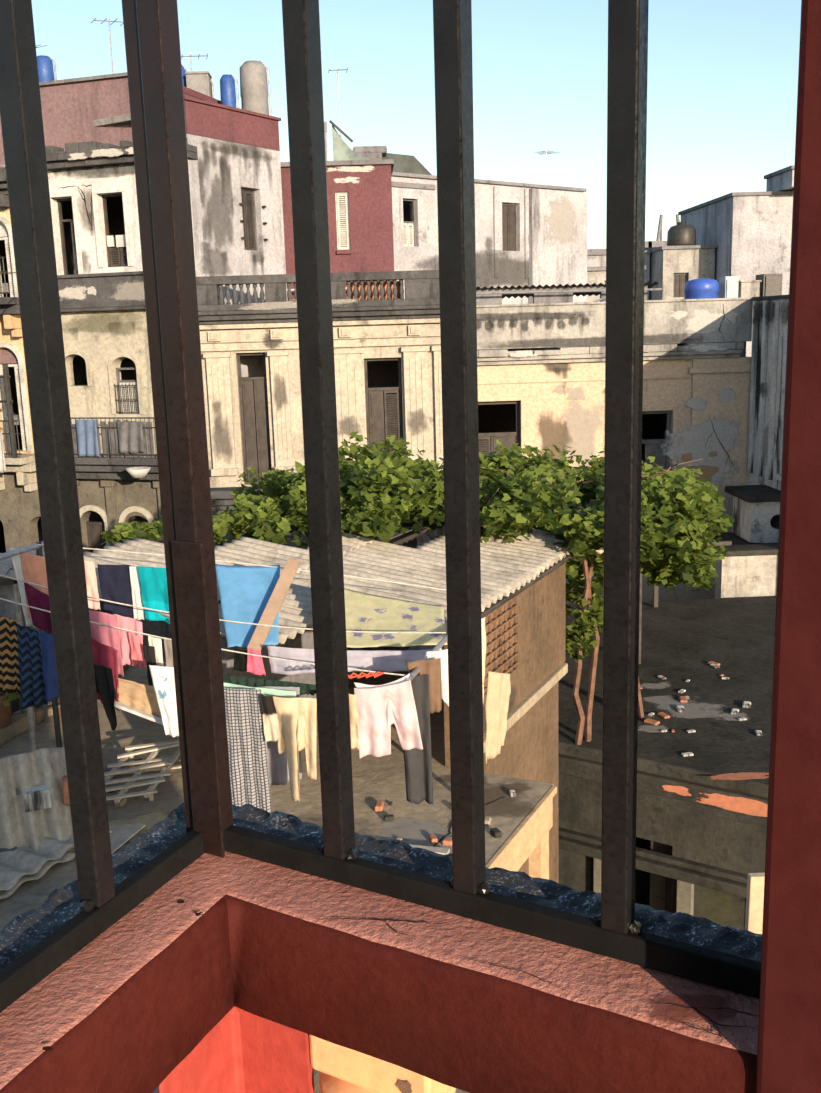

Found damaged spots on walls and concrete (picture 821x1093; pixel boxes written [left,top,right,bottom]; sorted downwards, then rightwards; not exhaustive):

peeling [68,147,134,160]
peeling [327,165,375,183]
peeling [59,286,96,300]
peeling [116,283,145,300]
water stain [546,363,570,372]
water stain [539,417,568,461]
peeling [665,388,740,487]
crack [705,415,736,470]
crack [331,918,443,937]
crack [655,1002,759,1040]
peeling [396,1079,412,1093]